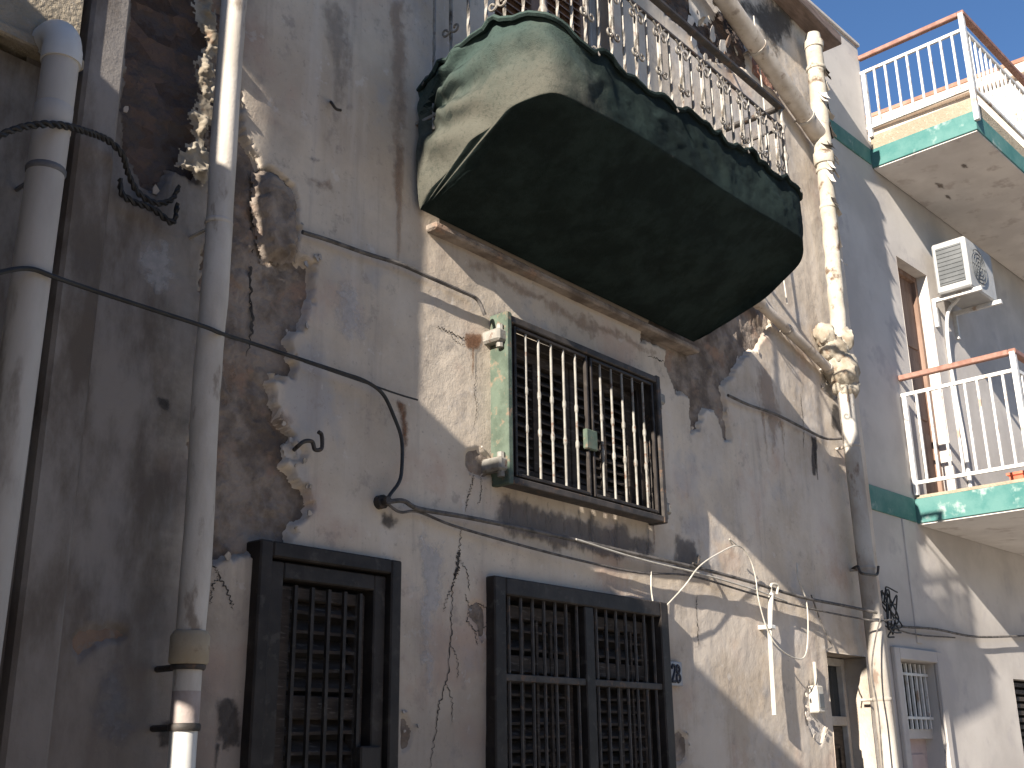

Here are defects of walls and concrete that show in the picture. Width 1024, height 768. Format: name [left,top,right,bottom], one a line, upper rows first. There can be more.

crack [246,168,260,355]
spalling [212,142,322,560]
corrosion [465,334,482,370]
spalling [640,307,773,440]
crack [209,566,234,608]
crack [430,475,487,765]
leakage [499,497,651,556]